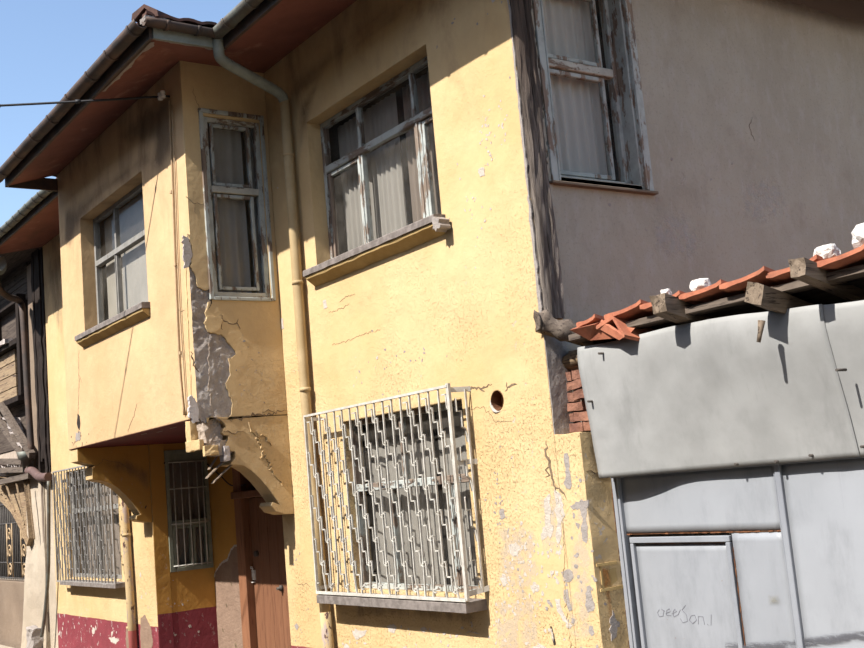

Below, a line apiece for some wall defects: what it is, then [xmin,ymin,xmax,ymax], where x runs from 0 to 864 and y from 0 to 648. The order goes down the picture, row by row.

spalling [141,234,245,484]
crack [468,382,516,422]
crack [224,409,284,486]
peeling [484,453,624,646]
crack [544,444,575,648]
peeling [109,624,129,648]
peeling [140,615,153,648]
peeling [342,629,367,648]